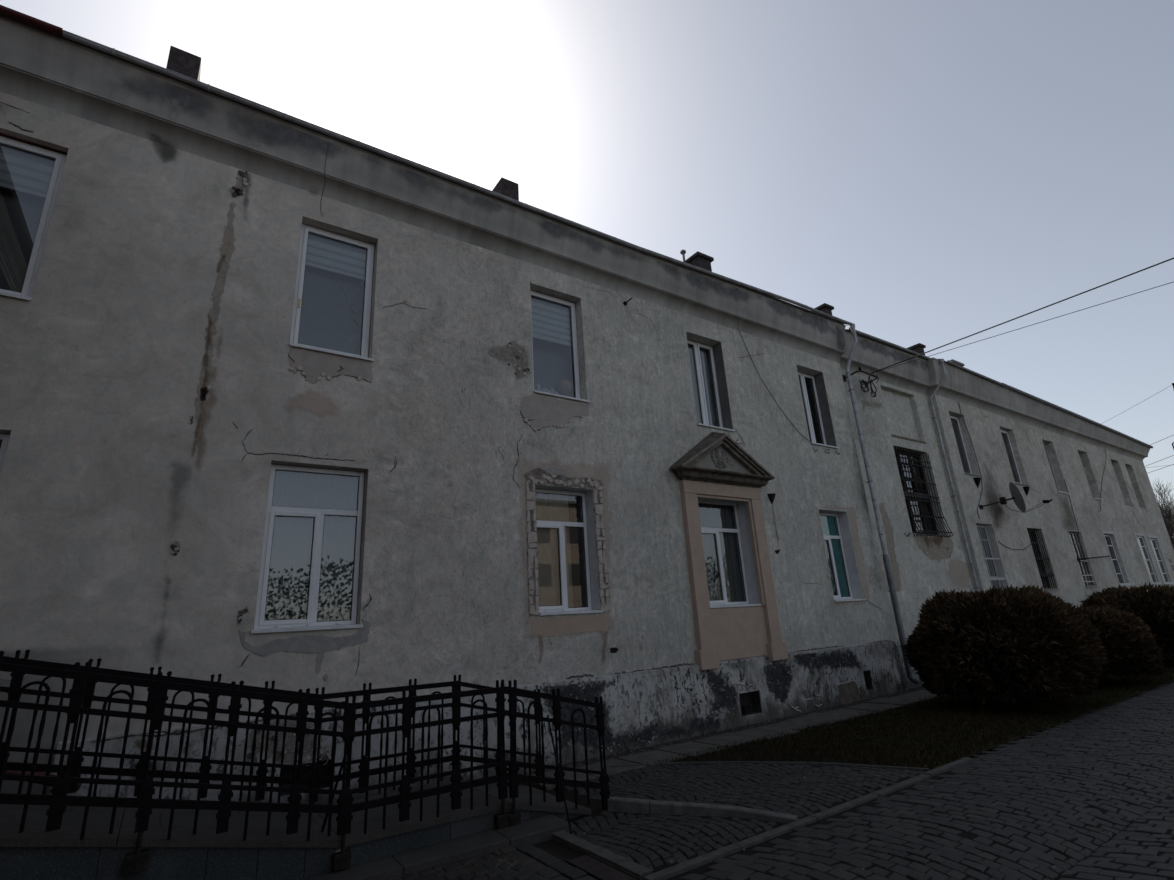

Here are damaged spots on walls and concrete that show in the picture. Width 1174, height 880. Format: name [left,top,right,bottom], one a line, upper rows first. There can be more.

crack [1,102,34,132]
peeling [289,348,373,384]
spalling [487,340,531,379]
crack [233,422,356,461]
leakage [764,647,861,707]